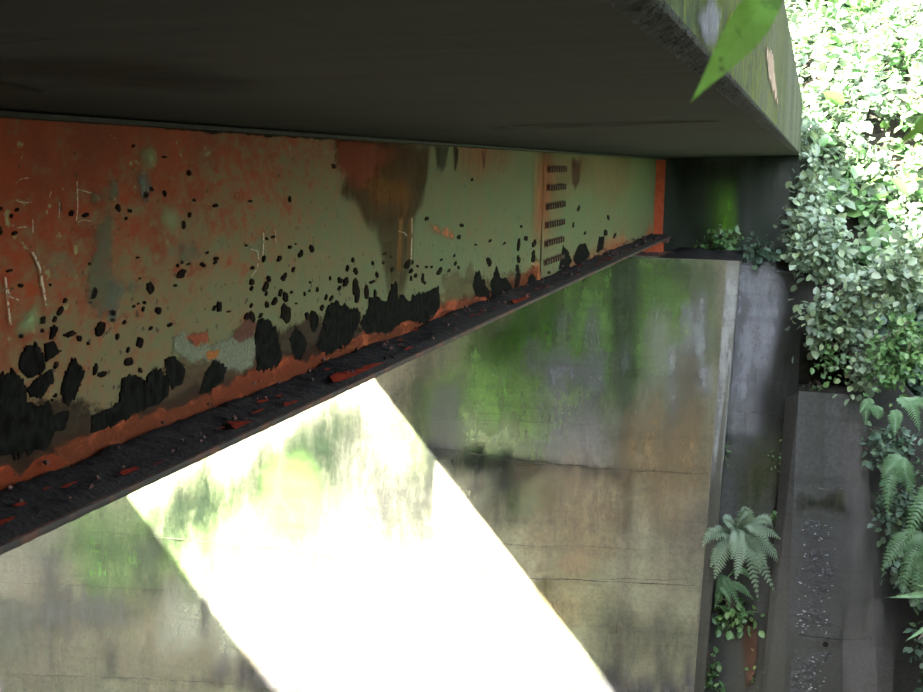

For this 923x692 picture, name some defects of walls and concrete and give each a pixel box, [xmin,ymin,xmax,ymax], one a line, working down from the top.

peeling [0,292,495,491]
rust [0,128,538,474]
damp [611,260,638,480]
damp [347,377,553,648]
damp [0,562,694,692]
spalling [790,649,832,692]